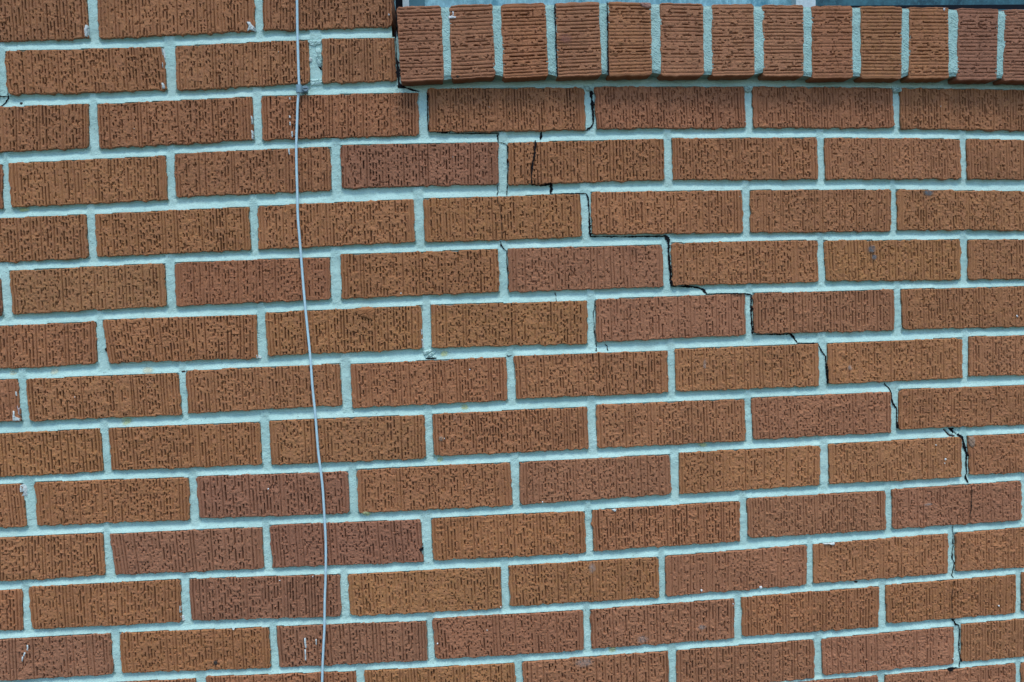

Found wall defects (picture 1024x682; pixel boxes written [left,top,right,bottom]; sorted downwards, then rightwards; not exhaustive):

crack [586,3,609,131]
crack [427,93,829,384]
crack [884,383,899,429]
crack [951,432,973,667]